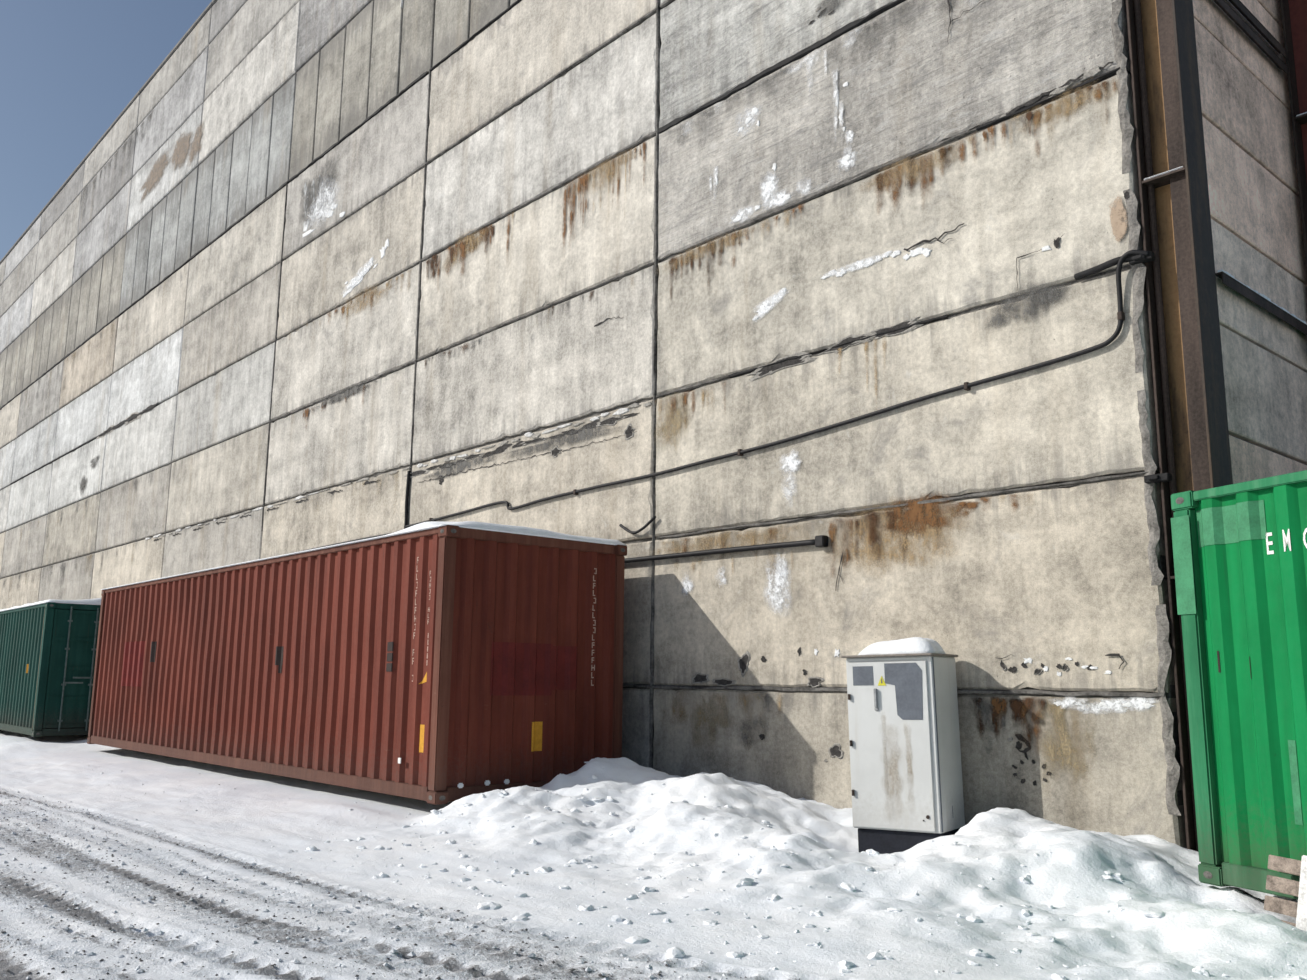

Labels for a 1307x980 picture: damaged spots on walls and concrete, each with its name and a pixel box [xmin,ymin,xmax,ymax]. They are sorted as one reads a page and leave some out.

leakage [767,55,854,169]
rust [876,81,1116,200]
rust [562,142,646,239]
leakage [732,163,810,222]
rust [426,214,513,278]
crack [903,223,964,261]
spalling [145,402,652,541]
rust [829,496,989,565]
leakage [765,559,790,610]
spalling [691,650,766,687]
spalling [797,647,824,688]
spalling [995,653,1124,677]